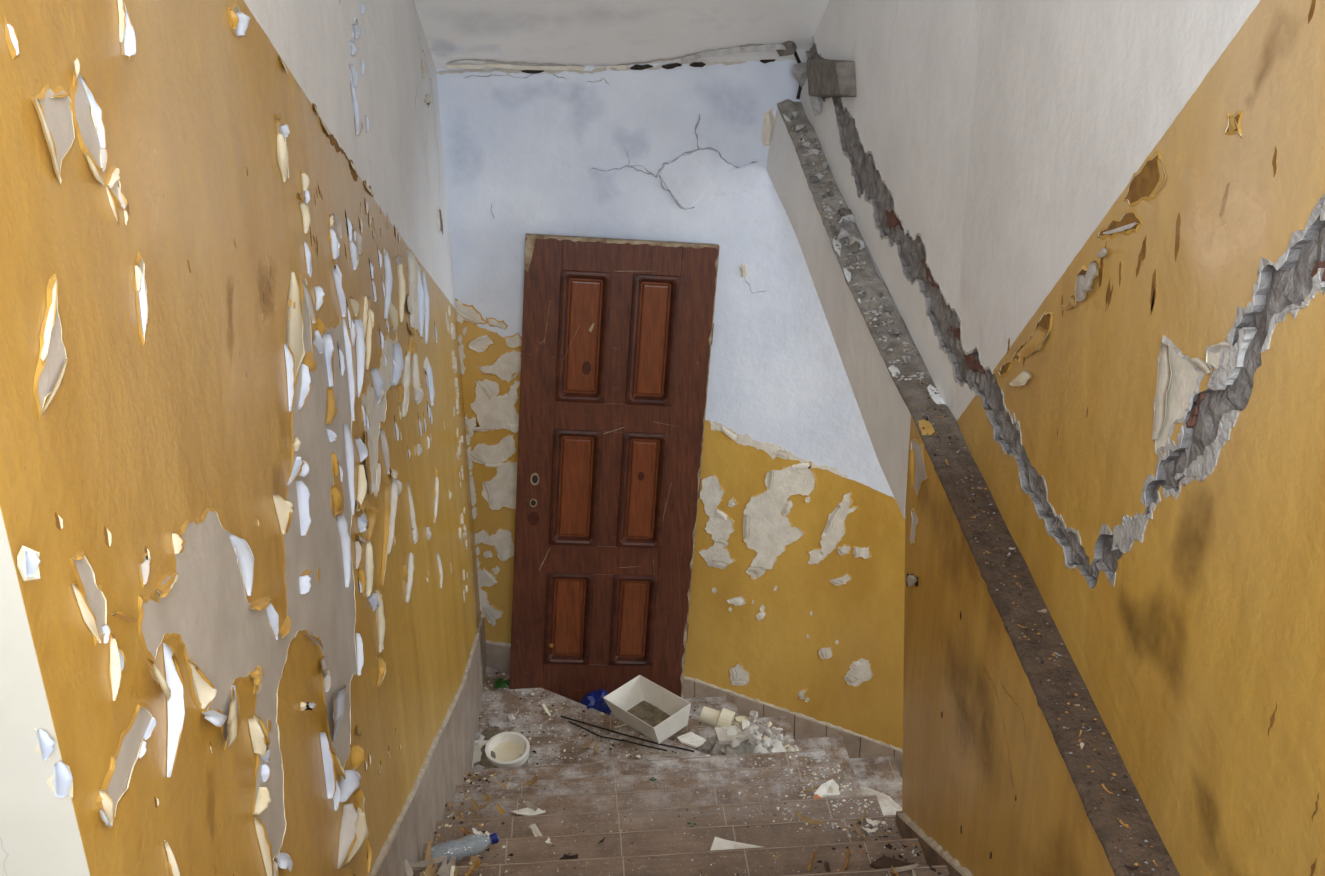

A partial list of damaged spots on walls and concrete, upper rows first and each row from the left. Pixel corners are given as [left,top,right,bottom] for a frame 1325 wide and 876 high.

crack [414,3,824,192]
peeling [995,150,1166,386]
peeling [33,274,68,419]
crack [824,97,1325,587]
peeling [17,545,41,581]
peeling [69,103,522,876]
peeling [712,587,766,622]
peeling [698,421,872,581]
peeling [828,572,852,587]
peeling [908,438,929,546]
peeling [34,728,73,798]
peeling [451,767,539,839]